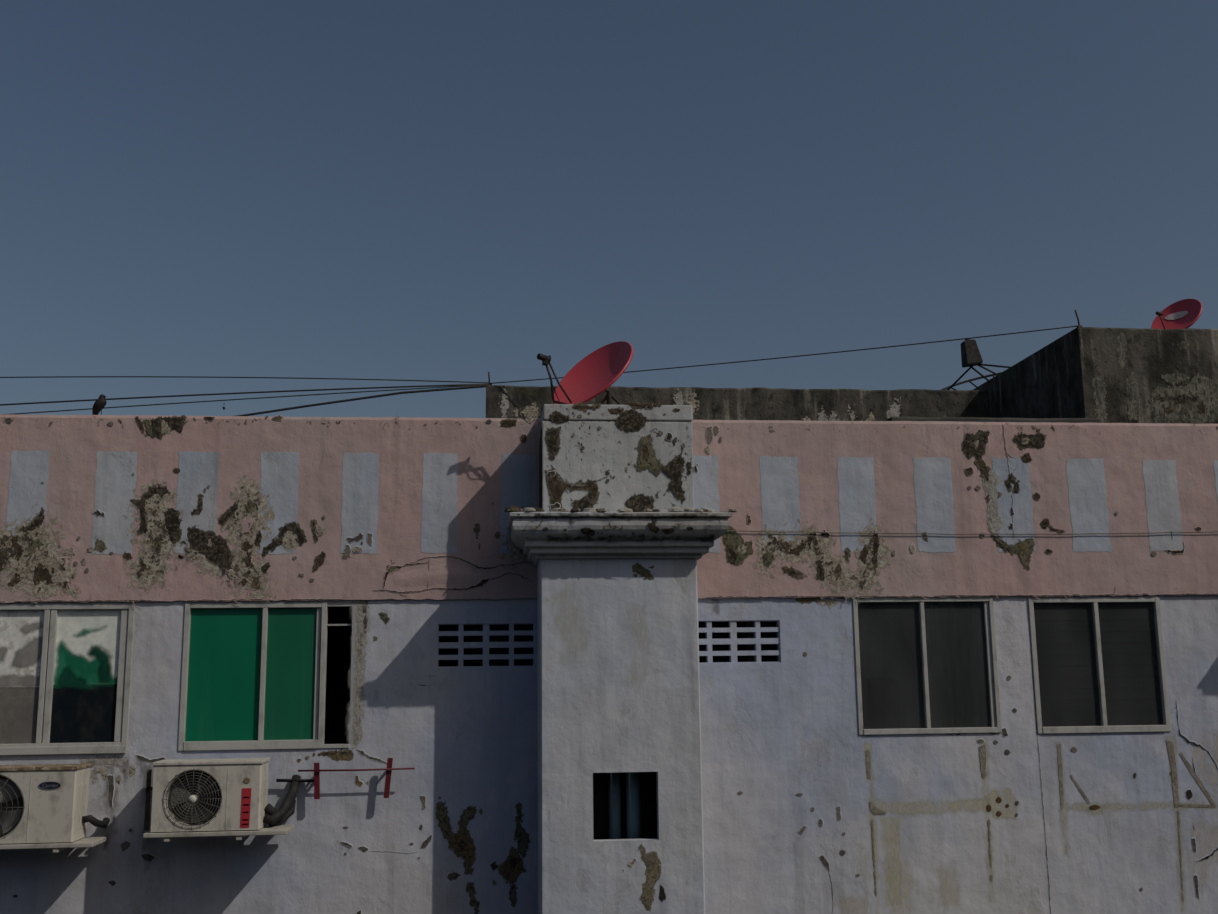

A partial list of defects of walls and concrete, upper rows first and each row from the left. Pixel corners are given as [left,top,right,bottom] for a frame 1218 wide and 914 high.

spalling [486,386,722,512]
peeling [0,468,326,605]
crack [188,555,533,604]
peeling [723,513,928,609]
peeling [961,430,1065,570]
crack [1164,530,1185,555]
crack [860,587,1156,914]
crack [1171,700,1218,773]
peeling [410,795,530,914]
peeling [623,845,666,911]
crack [827,871,835,914]
crack [1192,822,1218,863]